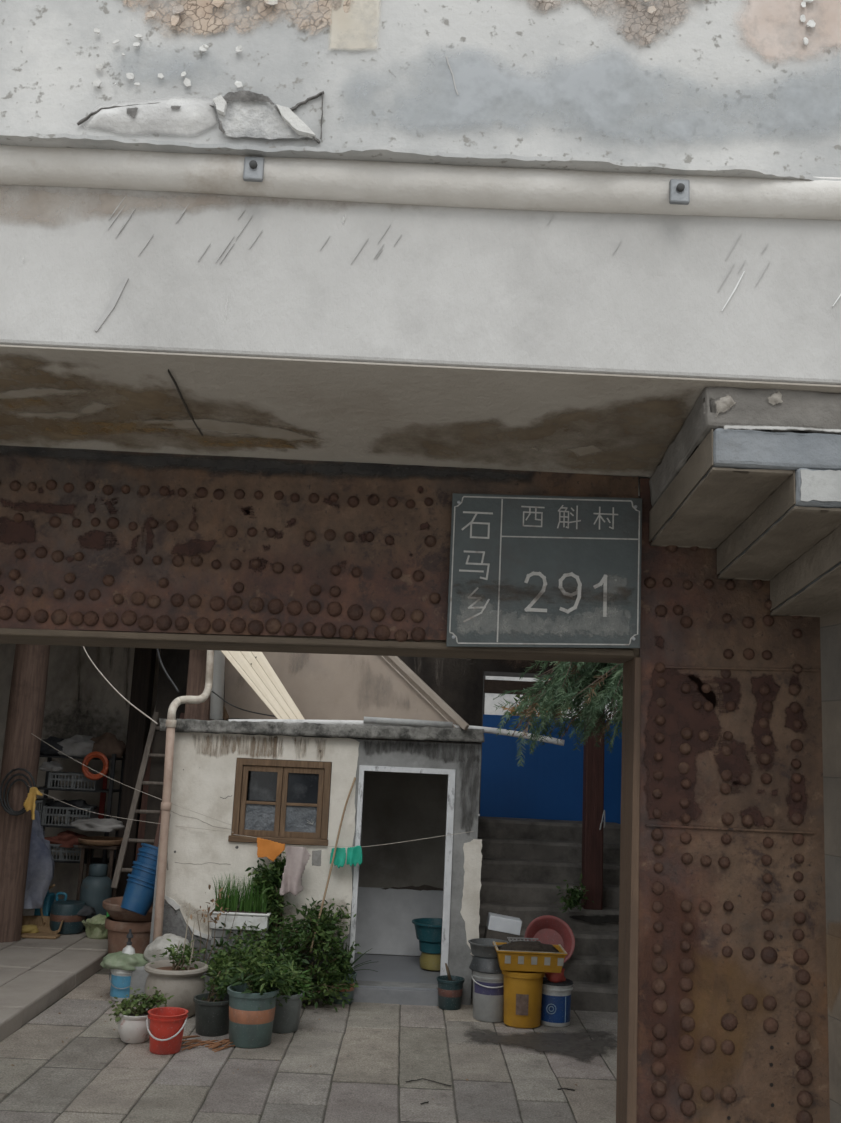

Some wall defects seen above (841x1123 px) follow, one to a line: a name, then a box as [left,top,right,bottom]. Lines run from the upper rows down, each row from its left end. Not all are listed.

flaking render [124,0,380,52]
flaking render [582,0,688,45]
flaking render [741,0,841,59]
flaking render [213,81,316,140]
leakage [0,356,687,482]
leakage [199,736,325,759]
peeling [643,668,808,826]
leakage [364,741,479,833]
flaking render [460,839,482,956]